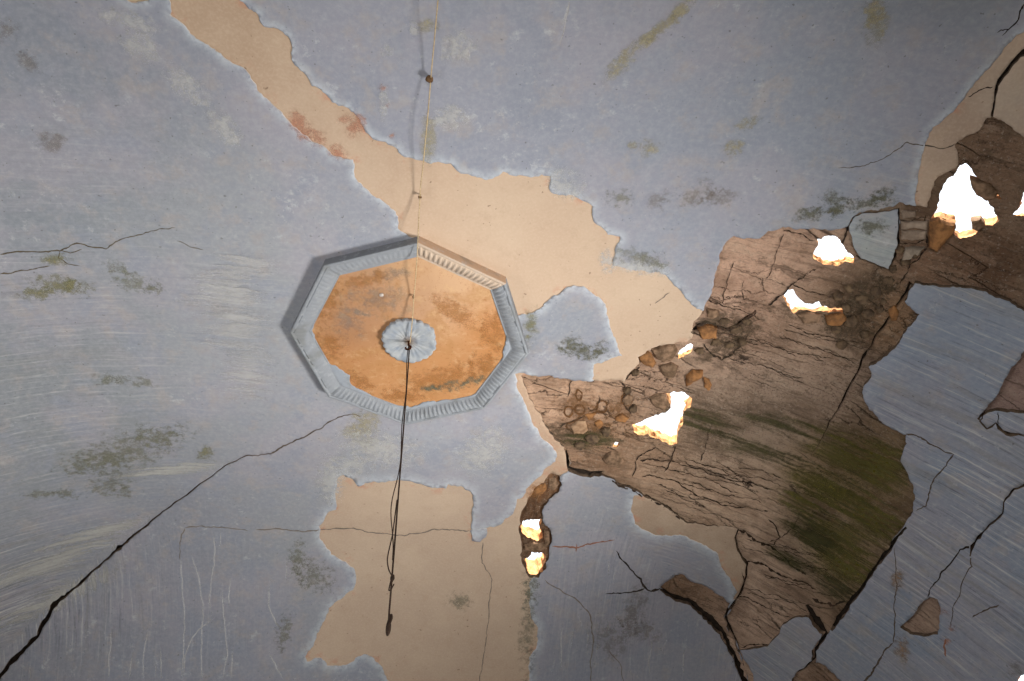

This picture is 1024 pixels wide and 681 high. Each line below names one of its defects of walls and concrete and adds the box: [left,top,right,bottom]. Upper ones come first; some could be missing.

leakage [25,276,76,298]
crack [0,228,202,274]
peeling [170,0,702,382]
leakage [560,339,604,360]
flaking render [305,32,1024,681]
crack [271,414,361,454]
leakage [1,568,108,627]
leakage [0,520,139,588]
crack [0,521,151,679]
crack [179,526,492,681]
crack [545,529,748,681]
crack [928,488,1014,656]